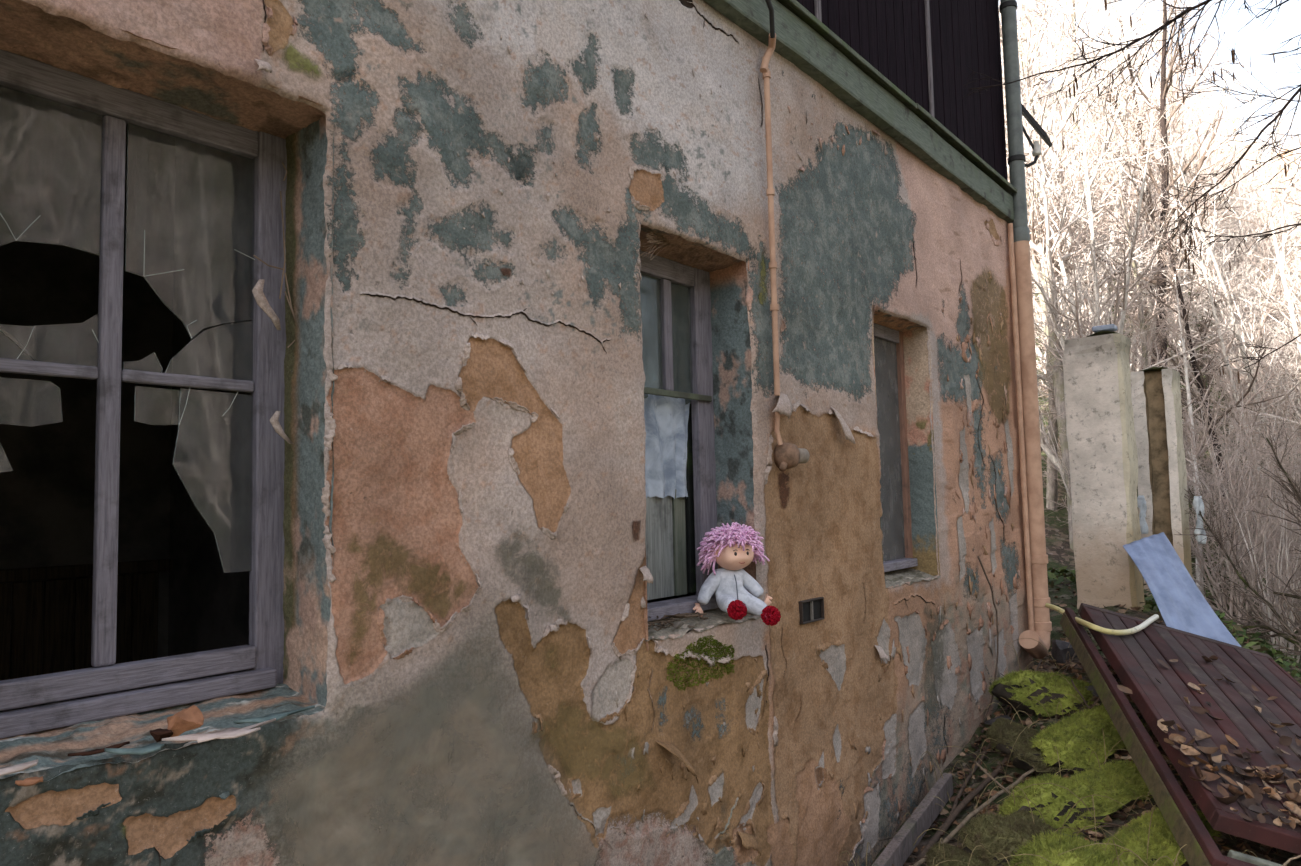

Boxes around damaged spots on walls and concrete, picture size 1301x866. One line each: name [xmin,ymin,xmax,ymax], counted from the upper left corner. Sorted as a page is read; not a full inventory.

peeling [255,0,640,293]
peeling [438,283,468,307]
crack [360,291,612,354]
peeling [269,411,293,444]
peeling [321,333,571,684]
peeling [495,93,1021,866]
peeling [68,705,315,756]
peeling [0,759,122,829]
peeling [123,791,281,866]